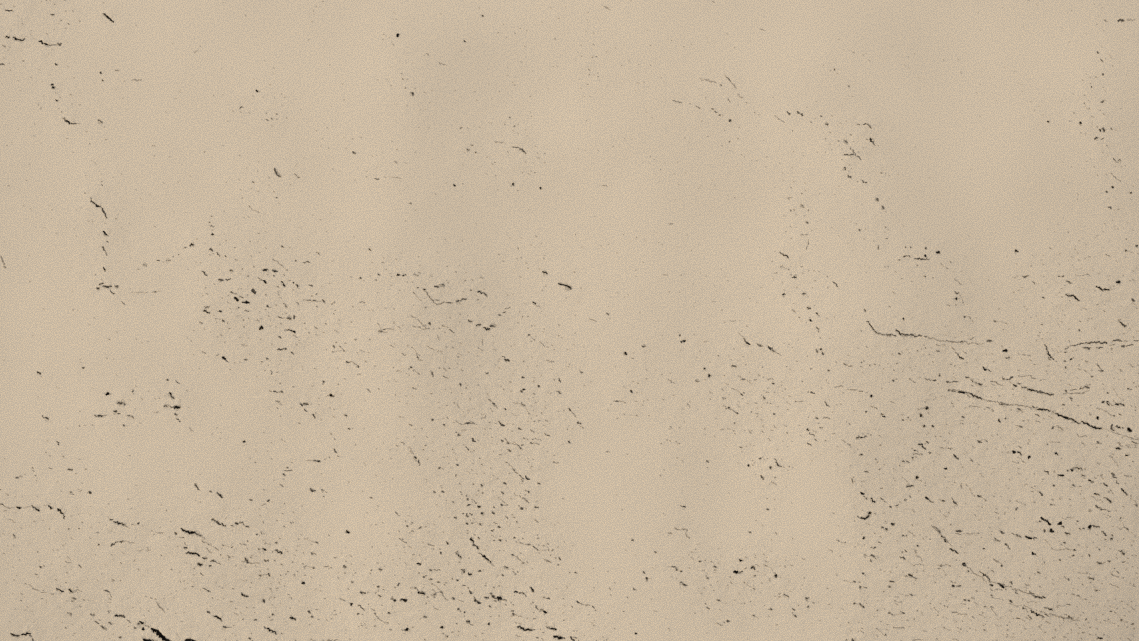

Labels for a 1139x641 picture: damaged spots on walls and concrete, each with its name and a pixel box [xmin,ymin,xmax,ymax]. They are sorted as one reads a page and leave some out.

crack [0,9,62,71]
crack [1022,275,1139,362]
crack [866,318,1139,621]
crack [857,487,875,520]
crack [28,584,231,641]